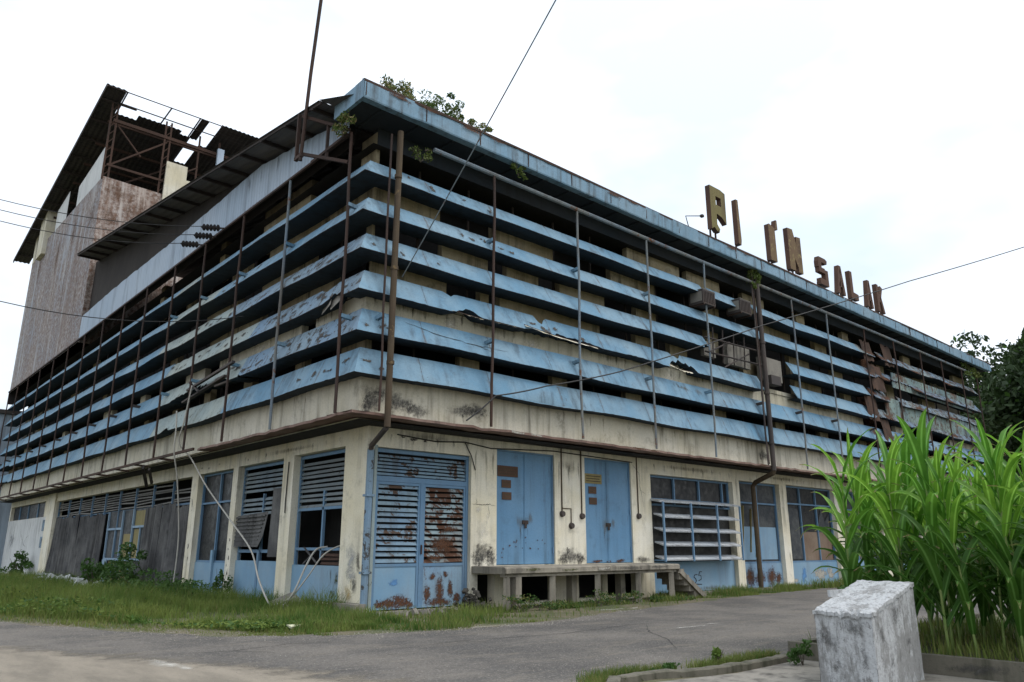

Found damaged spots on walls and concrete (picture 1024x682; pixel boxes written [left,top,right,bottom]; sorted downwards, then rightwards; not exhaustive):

leakage [364,391,425,415]
leakage [475,545,495,564]
rust [374,526,460,609]